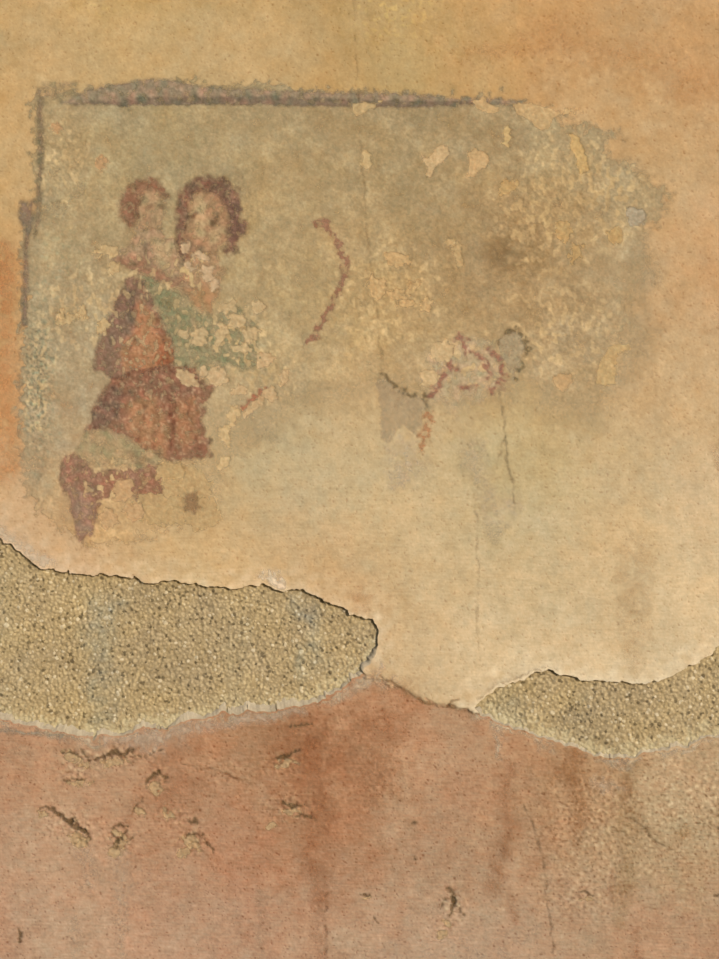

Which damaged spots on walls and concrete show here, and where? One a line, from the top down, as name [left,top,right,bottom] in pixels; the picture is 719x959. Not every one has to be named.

peeling [353,100,382,116]
peeling [422,145,450,177]
peeling [466,148,489,178]
peeling [181,241,219,292]
peeling [178,299,276,368]
peeling [380,338,454,397]
peeling [176,365,289,471]
peeling [99,461,223,532]
flaking render [0,538,379,769]
flaking render [475,646,719,771]
flaking render [38,806,91,848]
flaking render [438,887,464,940]